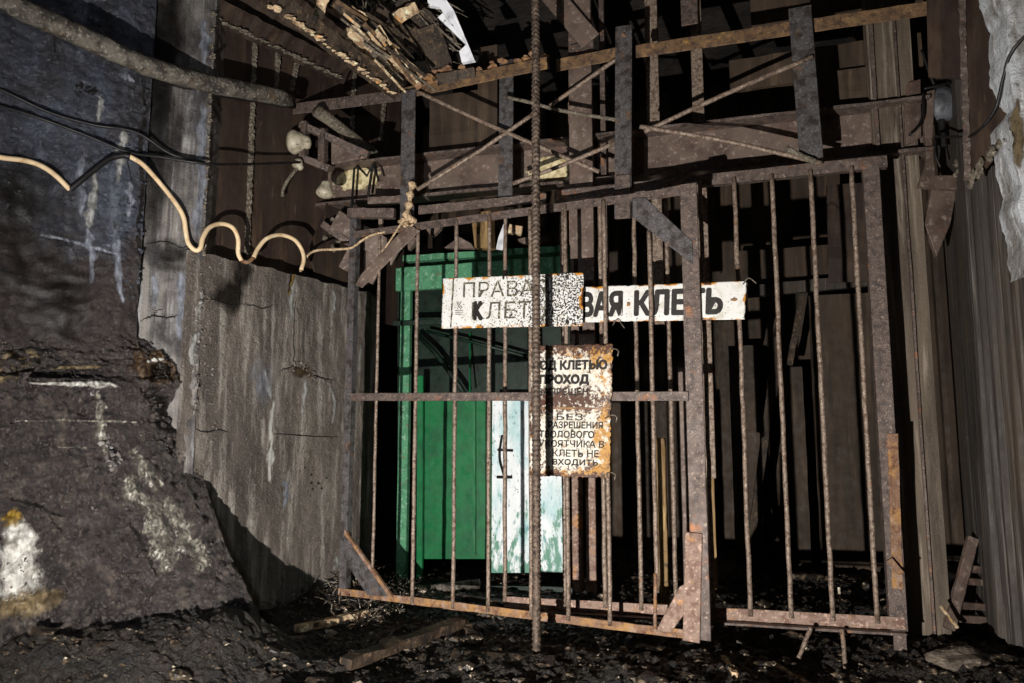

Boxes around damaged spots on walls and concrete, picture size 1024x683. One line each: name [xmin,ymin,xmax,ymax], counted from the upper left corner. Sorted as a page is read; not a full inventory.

crack [35,79,215,322]
leakage [288,274,296,322]
leakage [259,371,288,507]
crack [279,365,336,381]